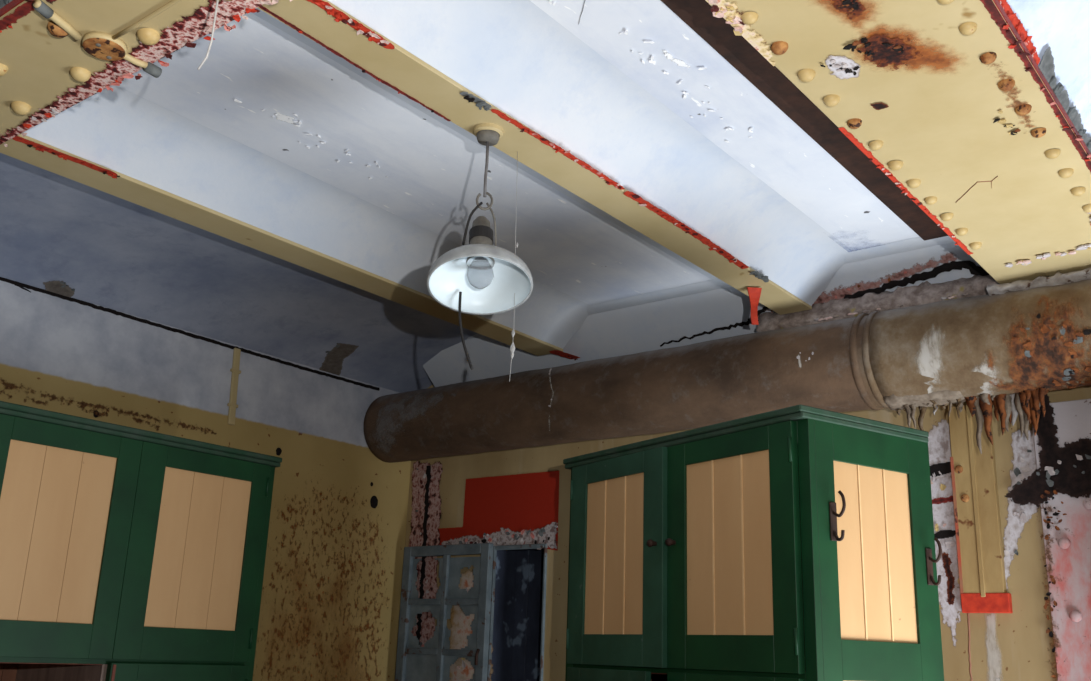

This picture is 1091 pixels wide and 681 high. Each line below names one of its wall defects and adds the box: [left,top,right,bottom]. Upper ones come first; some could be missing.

peeling [0,0,292,179]
peeling [307,0,394,49]
corrosion [818,0,958,71]
corrosion [993,64,1034,136]
crack [660,307,769,347]
crack [844,261,990,299]
corrosion [964,296,1091,454]
corrosion [261,487,389,681]
peeling [449,605,475,681]
peeling [408,460,558,647]
peeling [928,419,962,646]
spalling [1003,394,1091,590]